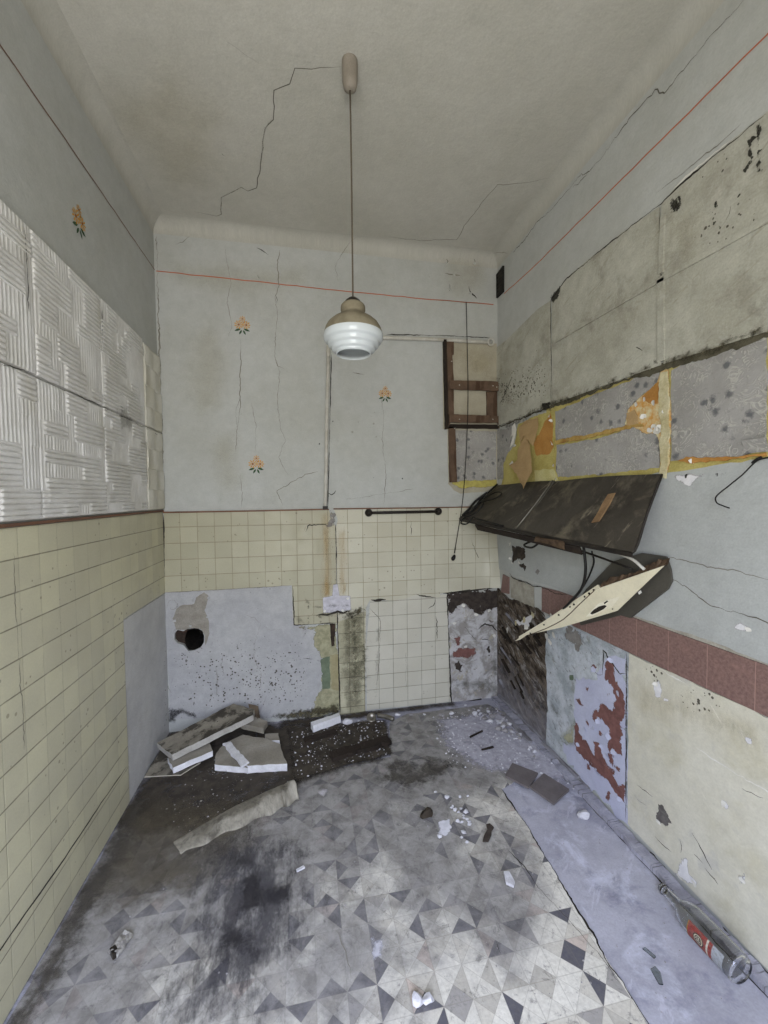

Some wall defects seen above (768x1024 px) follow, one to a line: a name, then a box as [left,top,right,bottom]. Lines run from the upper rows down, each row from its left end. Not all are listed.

crack [198,67,333,216]
crack [394,2,742,297]
leakage [743,124,763,173]
crack [225,248,314,505]
peeling [501,411,558,489]
peeling [625,369,704,486]
spalling [172,592,210,650]
peeling [299,584,351,718]
spalling [447,542,540,672]
peeling [574,657,625,803]
leakage [11,608,455,1024]
spalling [656,804,672,826]